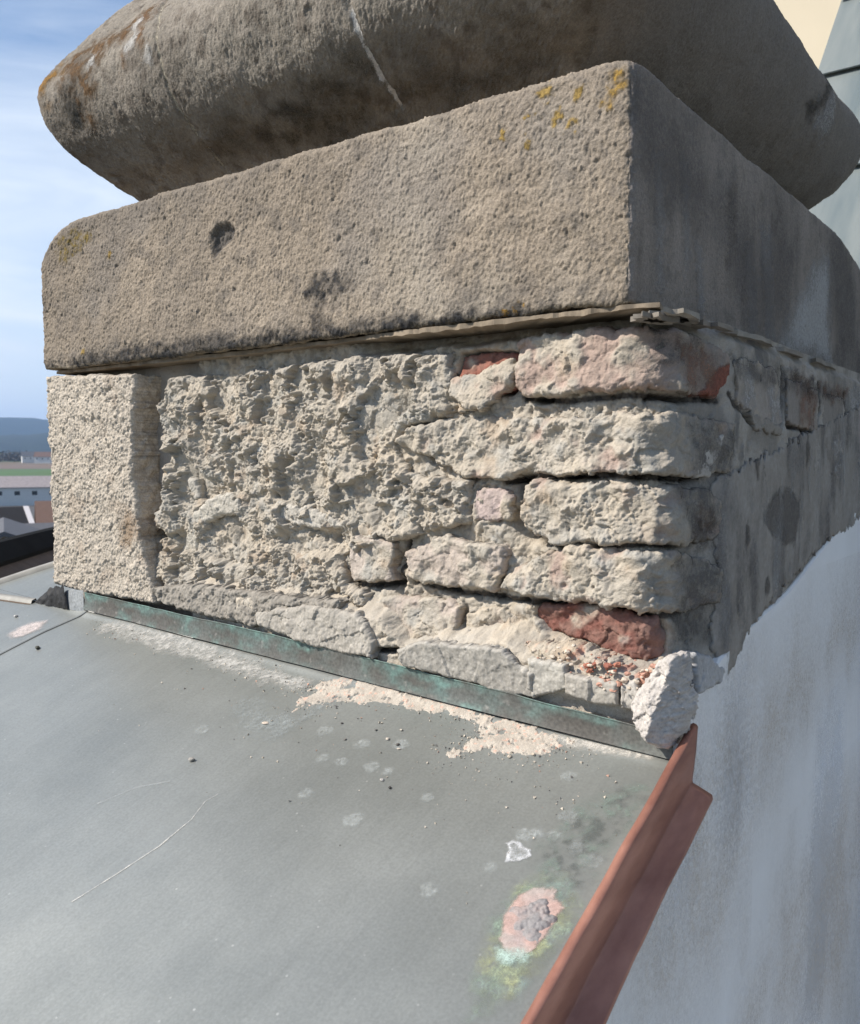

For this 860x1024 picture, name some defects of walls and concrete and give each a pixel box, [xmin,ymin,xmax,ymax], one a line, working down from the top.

spalling [151,352,478,659]
peeling [397,637,676,709]
rust [478,883,574,996]